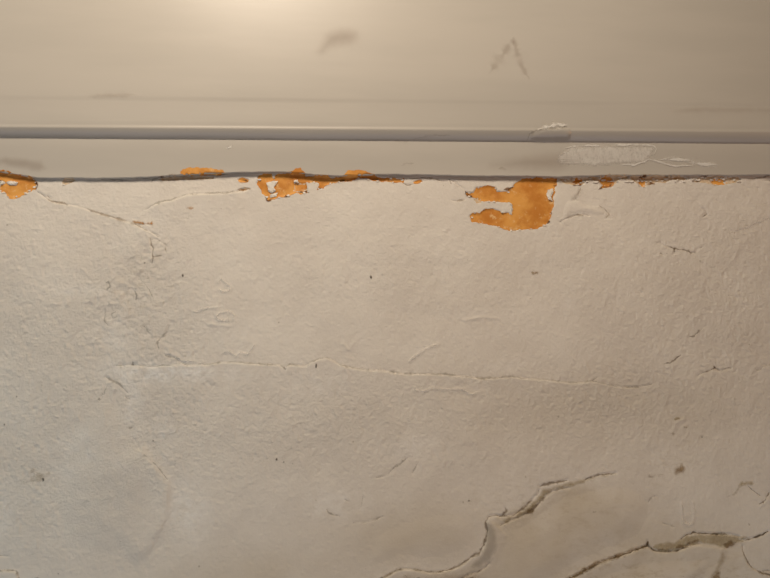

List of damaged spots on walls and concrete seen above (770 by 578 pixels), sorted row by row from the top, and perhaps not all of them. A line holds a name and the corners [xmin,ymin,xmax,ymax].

peeling [0,170,38,199]
peeling [159,167,225,181]
peeling [238,168,404,201]
peeling [465,174,741,231]
crack [439,481,568,572]
crack [613,532,719,558]